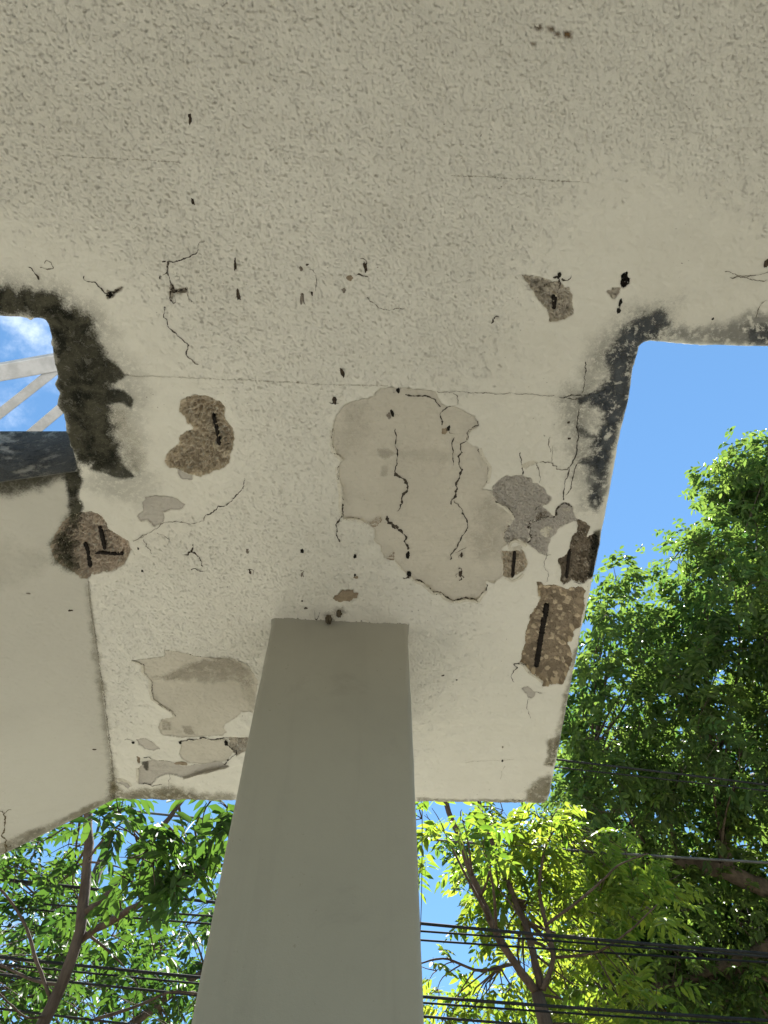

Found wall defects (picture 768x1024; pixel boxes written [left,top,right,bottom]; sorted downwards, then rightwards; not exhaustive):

mould [0,286,134,516]
spalling [50,511,131,579]
peeling [137,496,185,527]
crack [159,241,205,365]
spalling [165,394,235,480]
crack [370,429,411,579]
peeling [330,387,601,718]
crack [405,362,590,580]
spalling [522,272,574,322]
damp [578,310,670,508]
damp [749,328,768,342]
peeling [117,650,258,789]